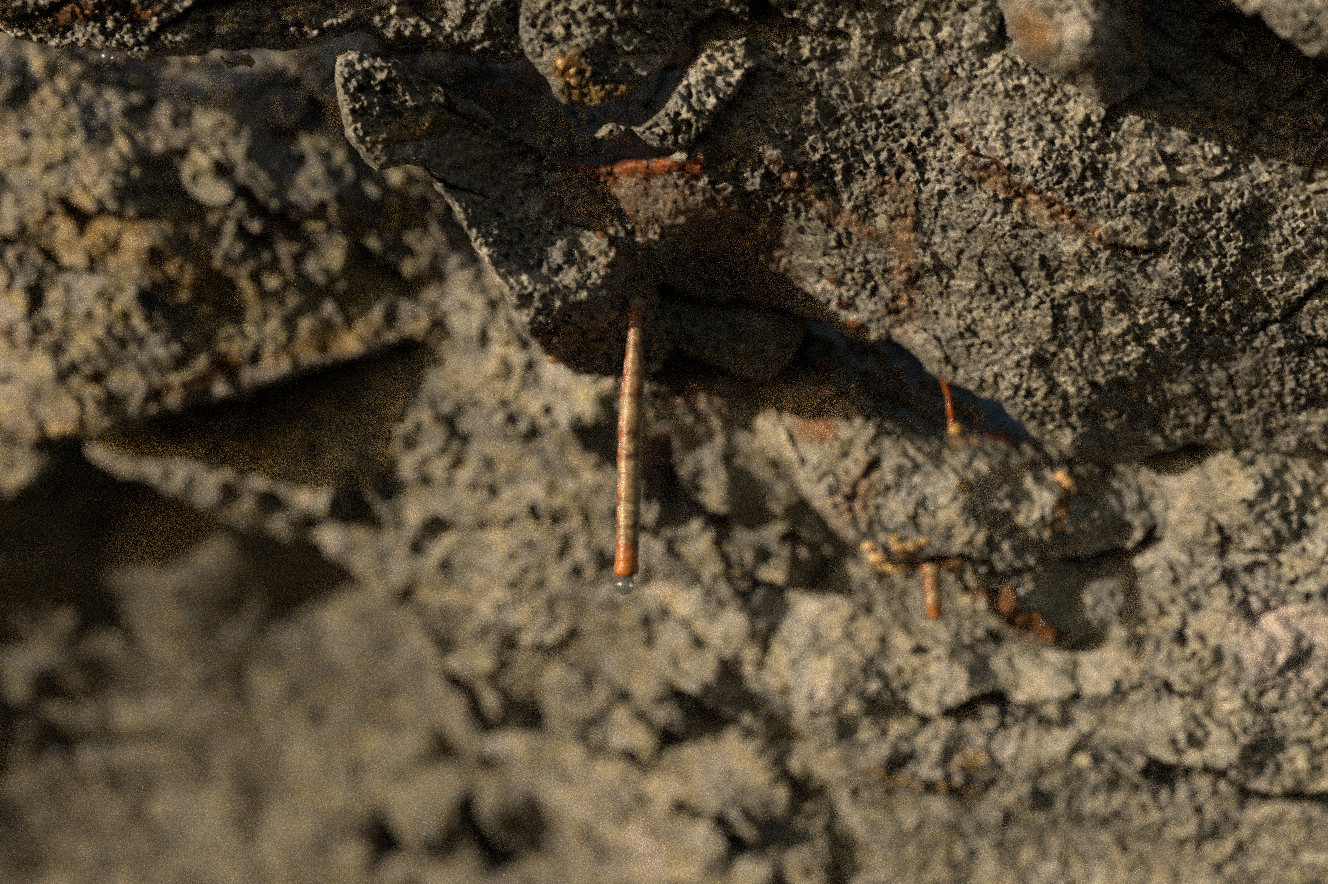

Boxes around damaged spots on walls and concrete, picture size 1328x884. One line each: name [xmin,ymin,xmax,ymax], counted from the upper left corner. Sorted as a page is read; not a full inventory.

rust [559,150,716,185]
rust [825,276,861,329]
crack [1160,279,1328,346]
rust [617,310,632,530]
rust [937,377,1022,447]
rust [885,541,964,582]